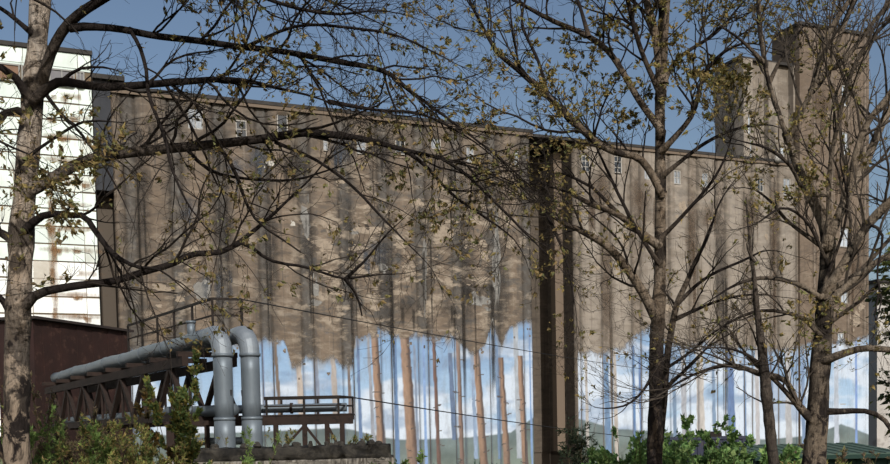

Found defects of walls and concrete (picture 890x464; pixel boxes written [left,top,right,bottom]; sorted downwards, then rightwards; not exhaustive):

rust [47,223,80,275]
damp [385,265,415,334]
damp [446,284,477,364]
damp [491,264,506,365]